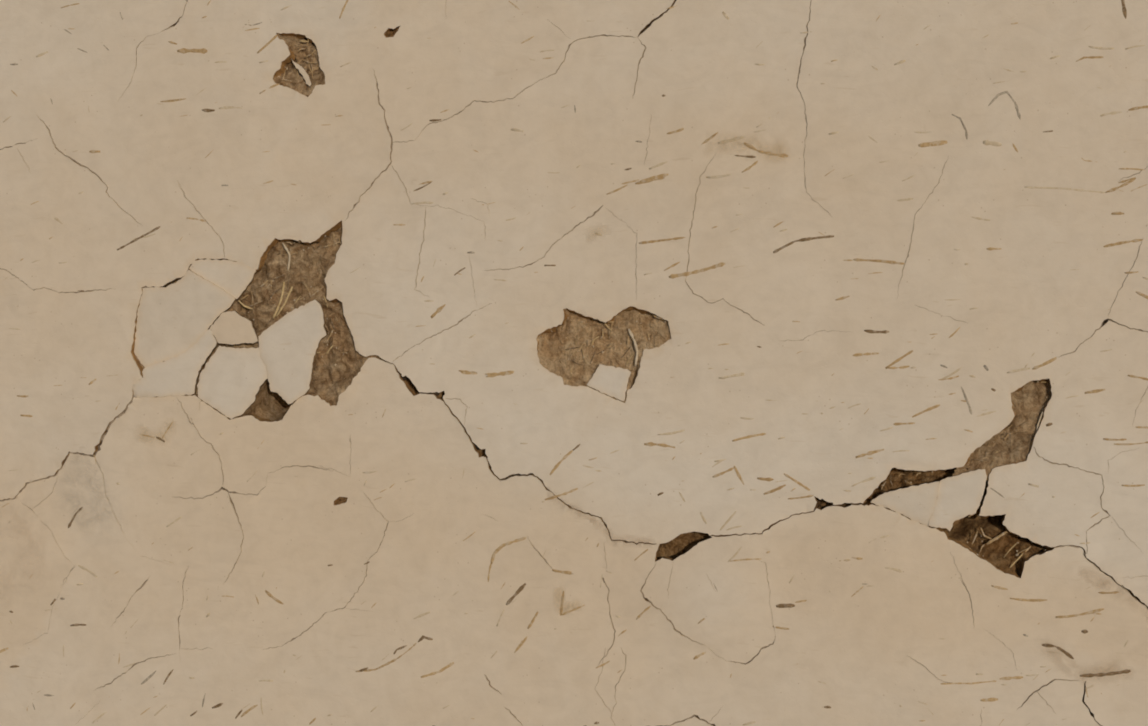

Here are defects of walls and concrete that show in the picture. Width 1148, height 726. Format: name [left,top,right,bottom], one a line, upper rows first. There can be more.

spalling [274,33,325,97]
spalling [132,225,380,421]
spalling [537,309,671,402]
crack [348,0,867,716]
crack [1060,242,1148,357]
crack [0,395,134,509]
crack [181,403,351,582]
hole [657,532,711,560]
spalling [864,379,1052,576]
crack [1035,387,1148,609]
crack [657,711,719,726]
crack [1018,679,1102,726]